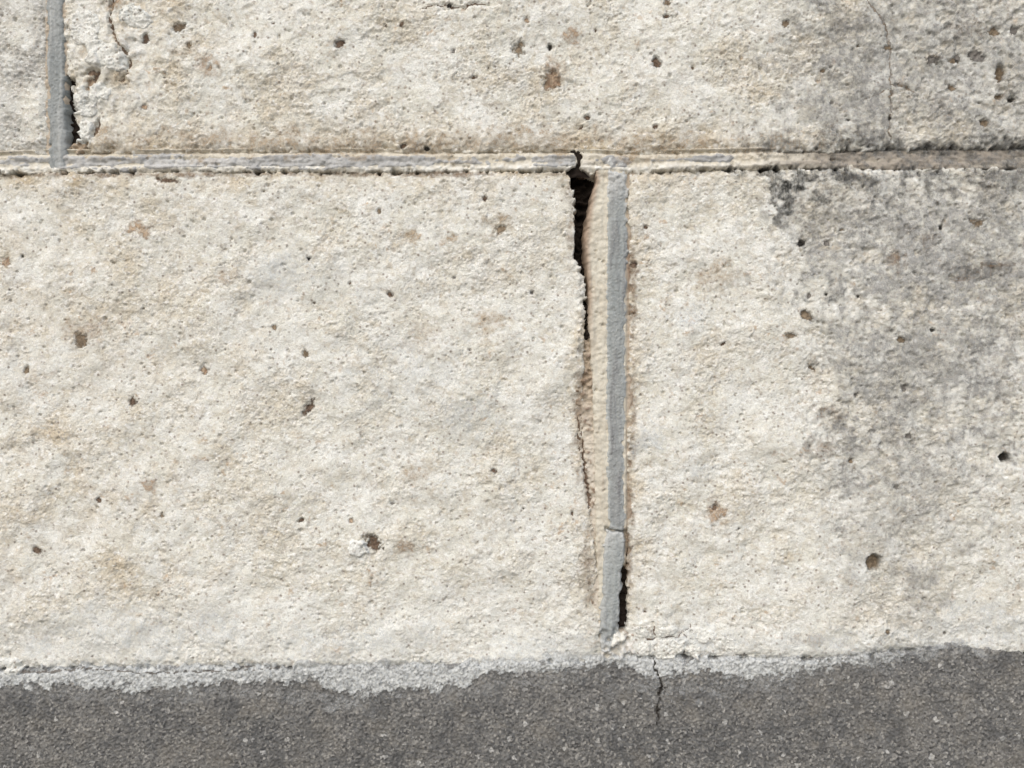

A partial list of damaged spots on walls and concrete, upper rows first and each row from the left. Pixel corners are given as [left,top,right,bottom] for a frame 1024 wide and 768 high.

spalling [70,10,130,72]
spalling [118,3,153,44]
spalling [73,80,112,144]
crack [566,150,594,340]
crack [577,414,592,509]